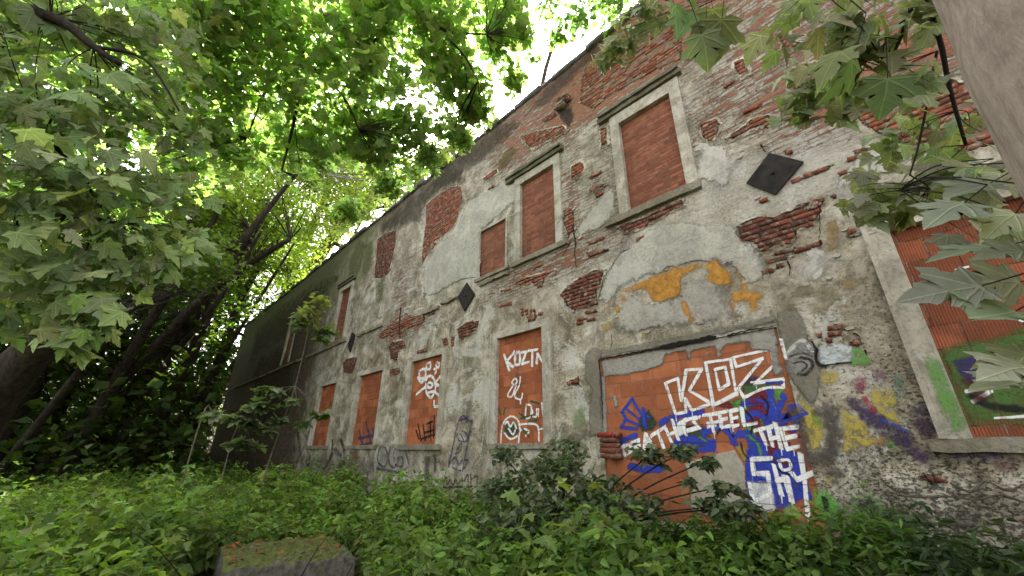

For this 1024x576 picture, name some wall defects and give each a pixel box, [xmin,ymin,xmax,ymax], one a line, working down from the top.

spalling [579,12,683,110]
peeling [693,103,792,187]
spalling [735,73,998,287]
spalling [373,230,397,280]
spalling [378,310,435,378]
spalling [421,185,469,267]
spalling [441,318,481,348]
spalling [498,263,557,323]
crack [563,225,577,267]
spalling [557,206,623,326]
spalling [616,197,687,241]
peeling [613,279,729,333]